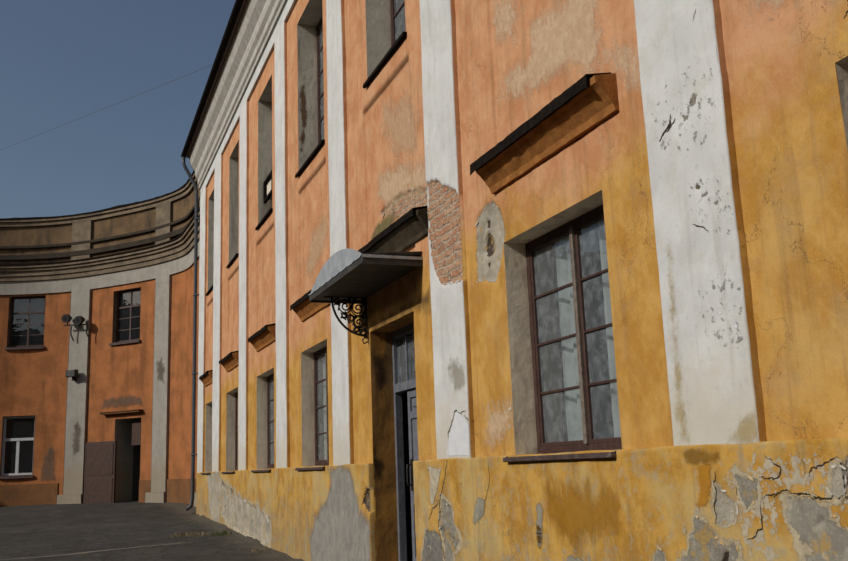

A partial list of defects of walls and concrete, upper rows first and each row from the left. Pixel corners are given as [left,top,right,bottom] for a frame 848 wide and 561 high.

peeling [651,65,715,144]
flaking render [378,163,463,285]
flaking render [475,200,505,284]
peeling [689,179,733,234]
peeling [447,412,470,456]
flaking render [207,472,272,548]
flaking render [362,488,370,512]
flaking render [421,465,463,561]
flaking render [650,449,848,561]
crack [747,456,848,540]